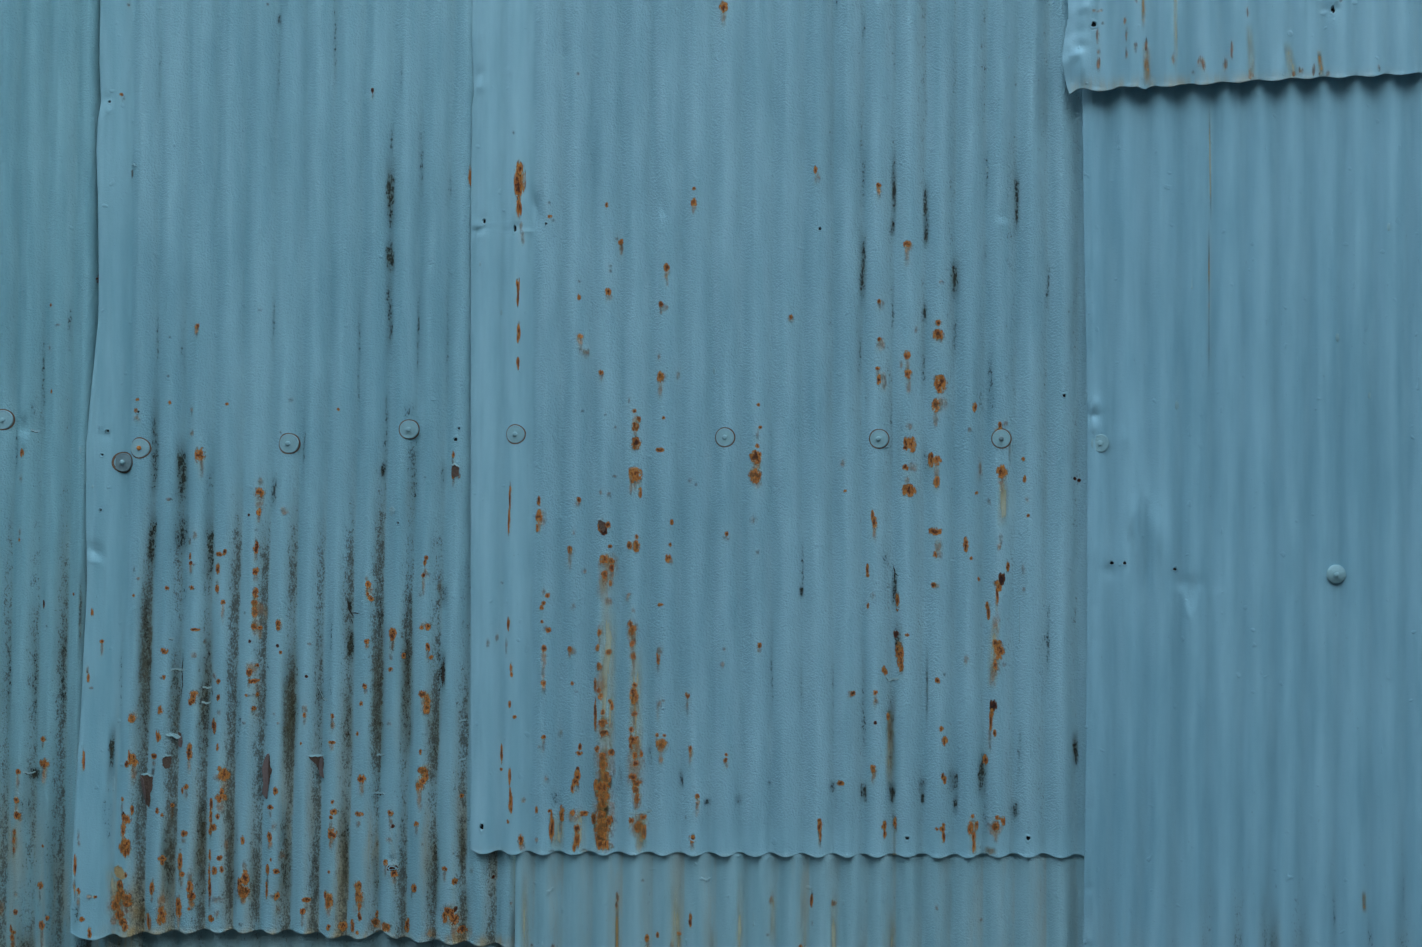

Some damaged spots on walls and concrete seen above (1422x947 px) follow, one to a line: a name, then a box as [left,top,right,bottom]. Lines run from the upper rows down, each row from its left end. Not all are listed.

corrosion [514,162,526,217]
corrosion [931,374,948,413]
corrosion [631,409,664,452]
corrosion [748,426,762,484]
corrosion [902,436,942,497]
corrosion [597,519,640,586]
corrosion [248,541,282,654]
corrosion [977,561,1010,620]
corrosion [882,630,909,676]
corrosion [535,629,668,852]
corrosion [73,718,280,932]
corrosion [300,881,409,935]